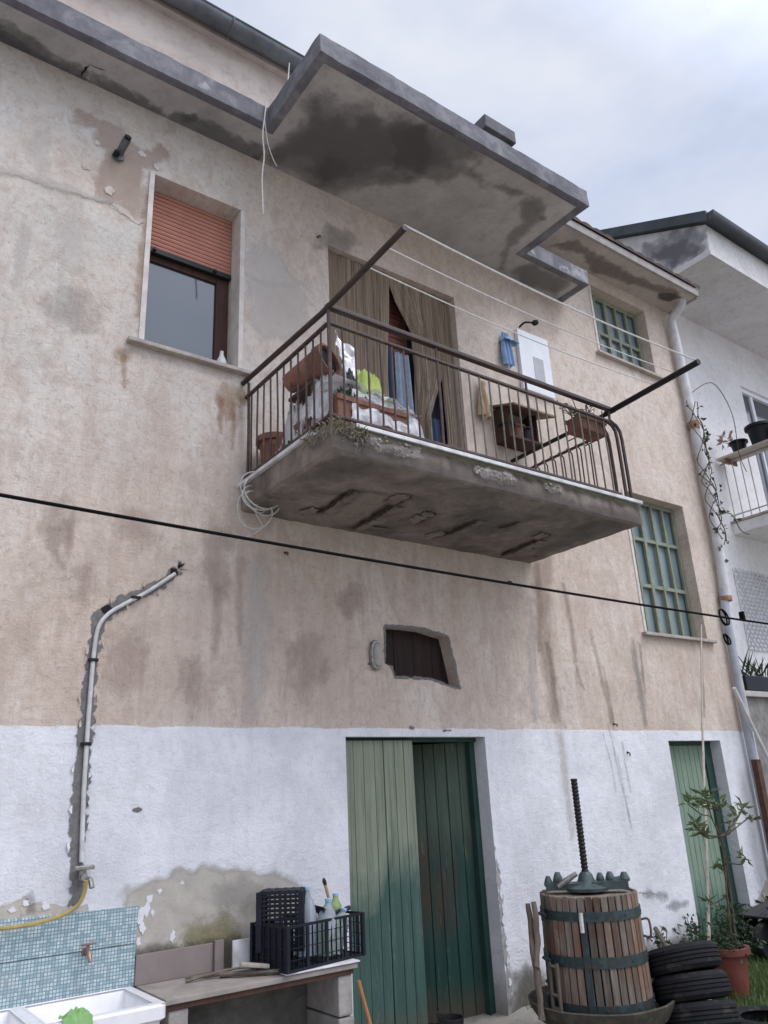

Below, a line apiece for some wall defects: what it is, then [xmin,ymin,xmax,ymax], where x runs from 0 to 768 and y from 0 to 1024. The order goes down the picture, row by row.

peeling [80,116,167,217]
damp [557,242,680,301]
damp [644,229,704,267]
spalling [474,466,517,486]
peeling [125,865,299,969]